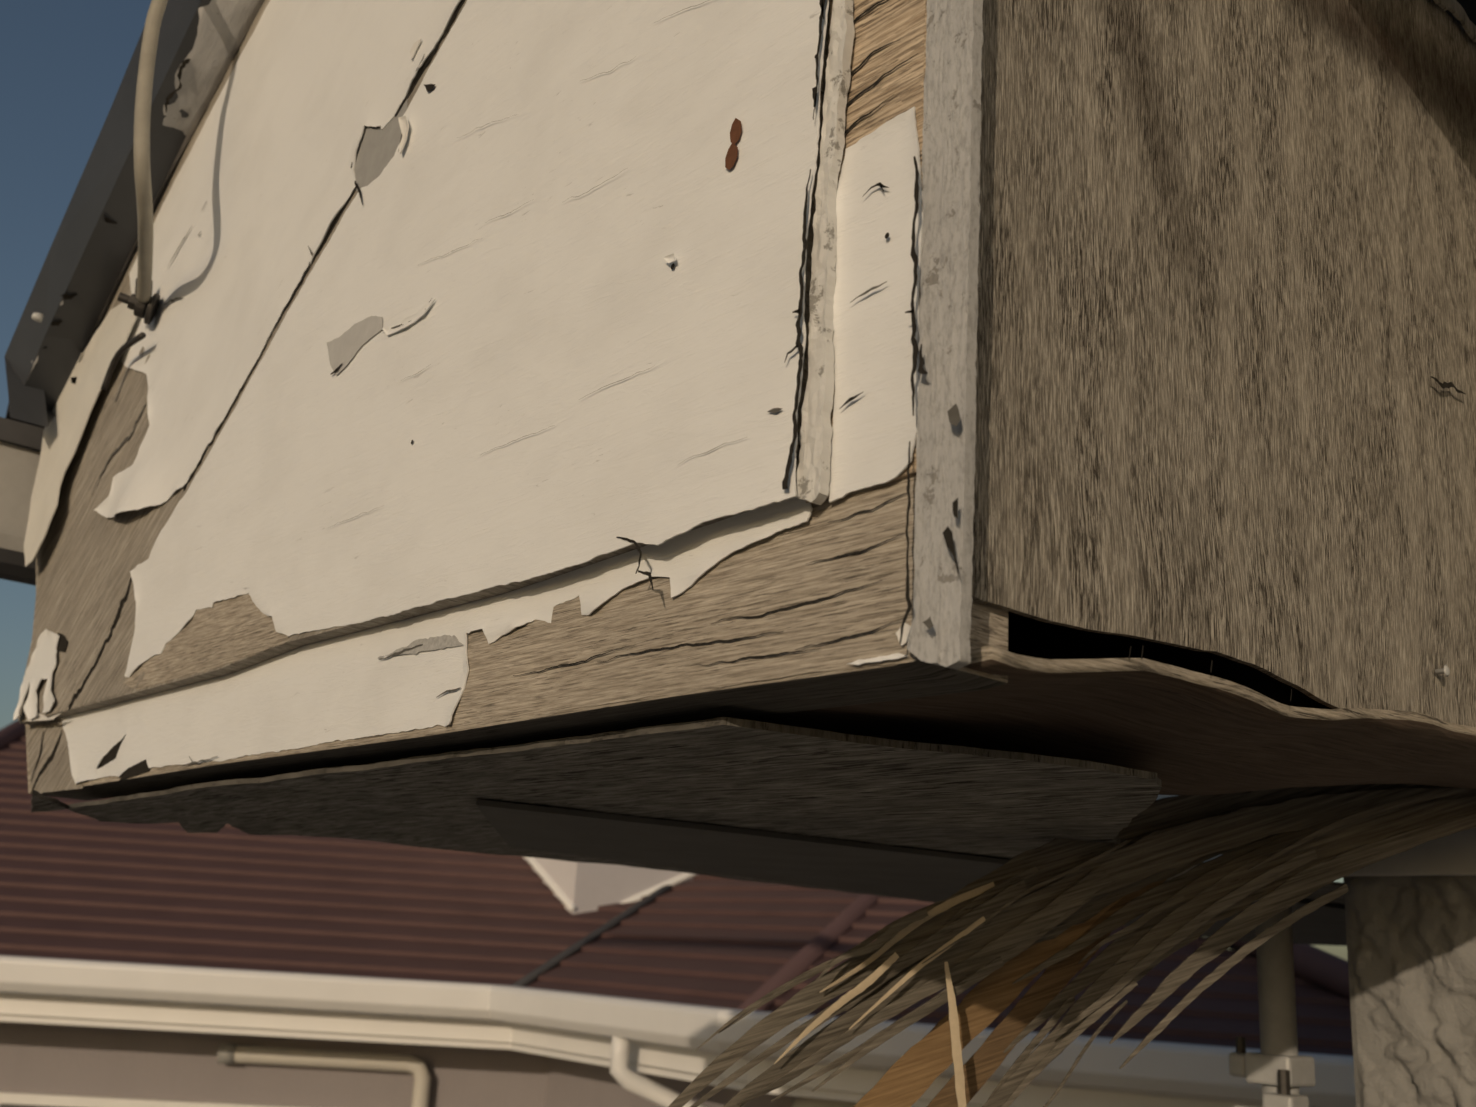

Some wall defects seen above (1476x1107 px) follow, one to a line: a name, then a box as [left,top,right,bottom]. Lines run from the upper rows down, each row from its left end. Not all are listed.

crack [395,0,464,117]
crack [812,0,826,120]
peeling [351,99,409,205]
rust [725,118,742,170]
crack [183,186,356,491]
peeling [327,298,436,375]
crack [782,169,811,490]
peeling [947,404,961,426]
peeling [13,303,289,794]
crack [616,537,654,590]
peeling [378,475,934,729]
peeling [943,498,959,575]